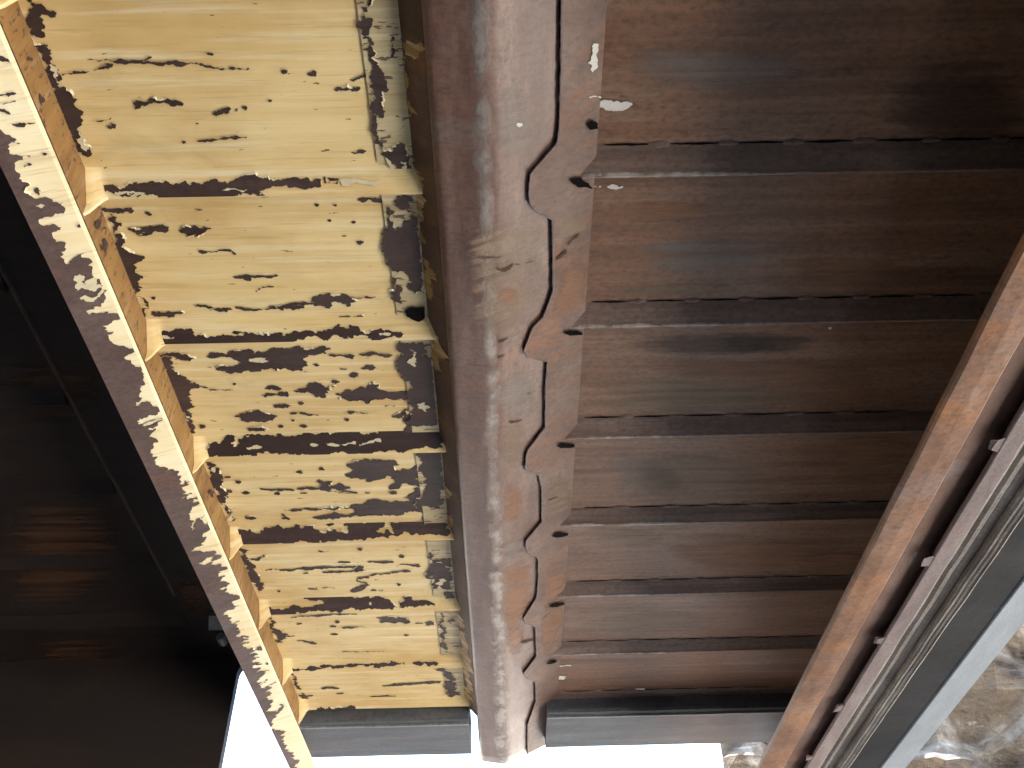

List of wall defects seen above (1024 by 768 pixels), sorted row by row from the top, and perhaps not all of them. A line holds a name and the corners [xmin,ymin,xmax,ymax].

peeling [334,0,389,119]
peeling [588,43,599,72]
peeling [133,96,184,110]
peeling [213,106,247,117]
peeling [589,96,632,111]
peeling [0,122,461,768]